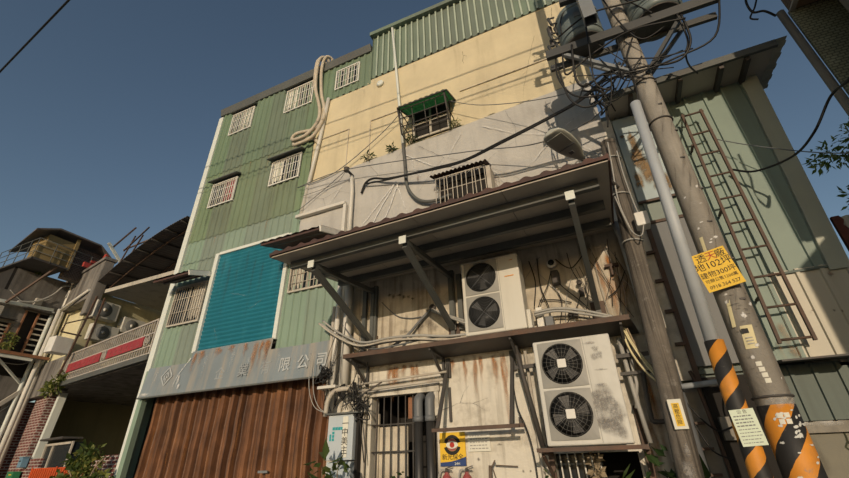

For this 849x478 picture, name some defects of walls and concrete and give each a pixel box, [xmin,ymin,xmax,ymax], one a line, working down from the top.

crack [362,133,516,225]
peeling [620,134,656,187]
peeling [773,409,814,446]